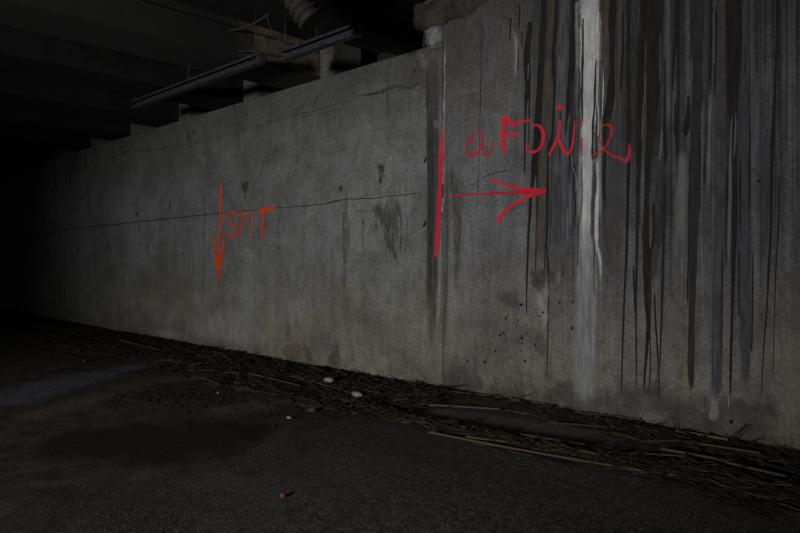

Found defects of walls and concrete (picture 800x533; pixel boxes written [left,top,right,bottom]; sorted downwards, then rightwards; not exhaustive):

crack [13,192,417,236]
water stain [375,201,402,258]
water stain [426,62,460,334]
water stain [504,0,779,419]